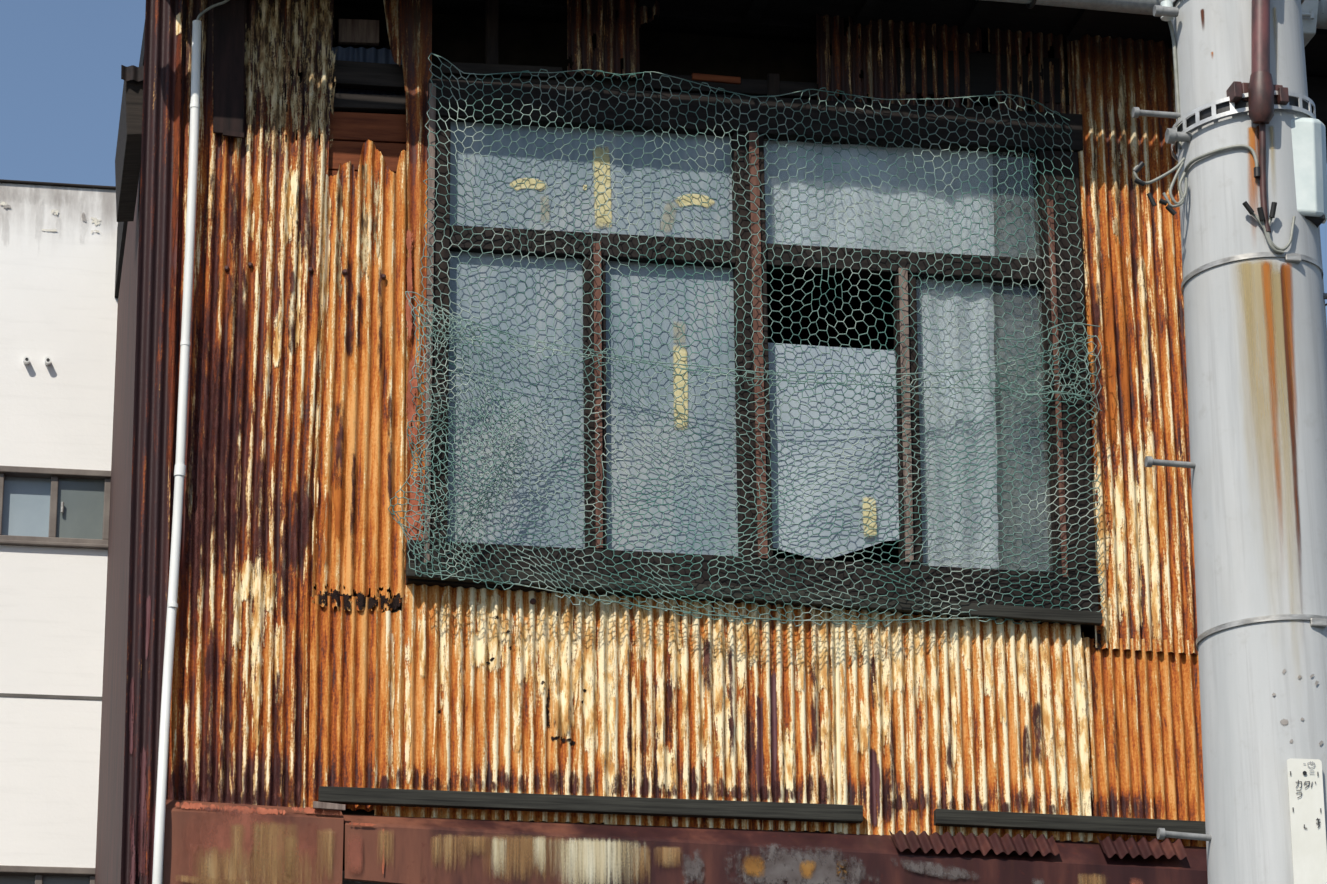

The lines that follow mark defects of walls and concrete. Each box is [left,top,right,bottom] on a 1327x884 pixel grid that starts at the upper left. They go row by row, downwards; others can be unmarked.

rust [171,13,182,248]
peeling [236,0,337,156]
rust [344,255,383,372]
rust [1087,179,1138,444]
rust [1242,262,1300,545]
rust [166,174,304,808]
rust [280,475,312,620]
rust [334,403,356,564]
rust [378,765,594,794]
rust [611,649,829,801]
rust [869,698,1071,827]
rust [1091,630,1102,710]